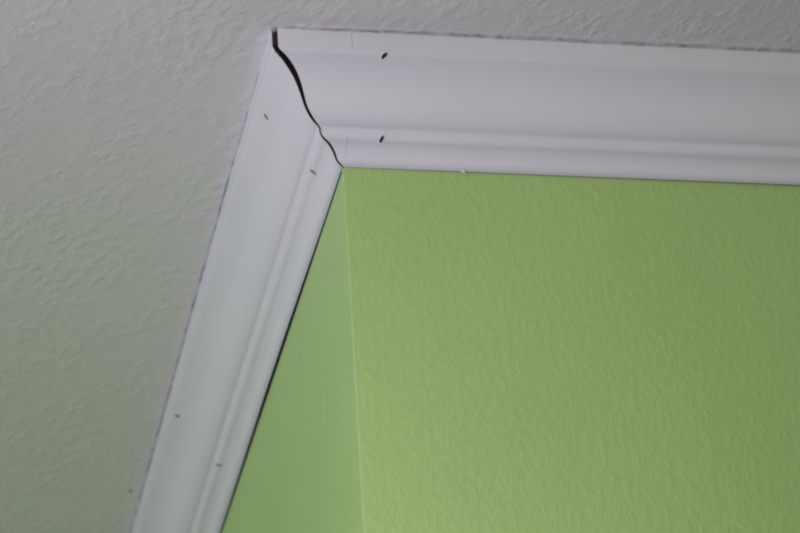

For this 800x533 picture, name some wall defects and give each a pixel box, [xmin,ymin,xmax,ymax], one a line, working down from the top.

crack [220,25,800,533]